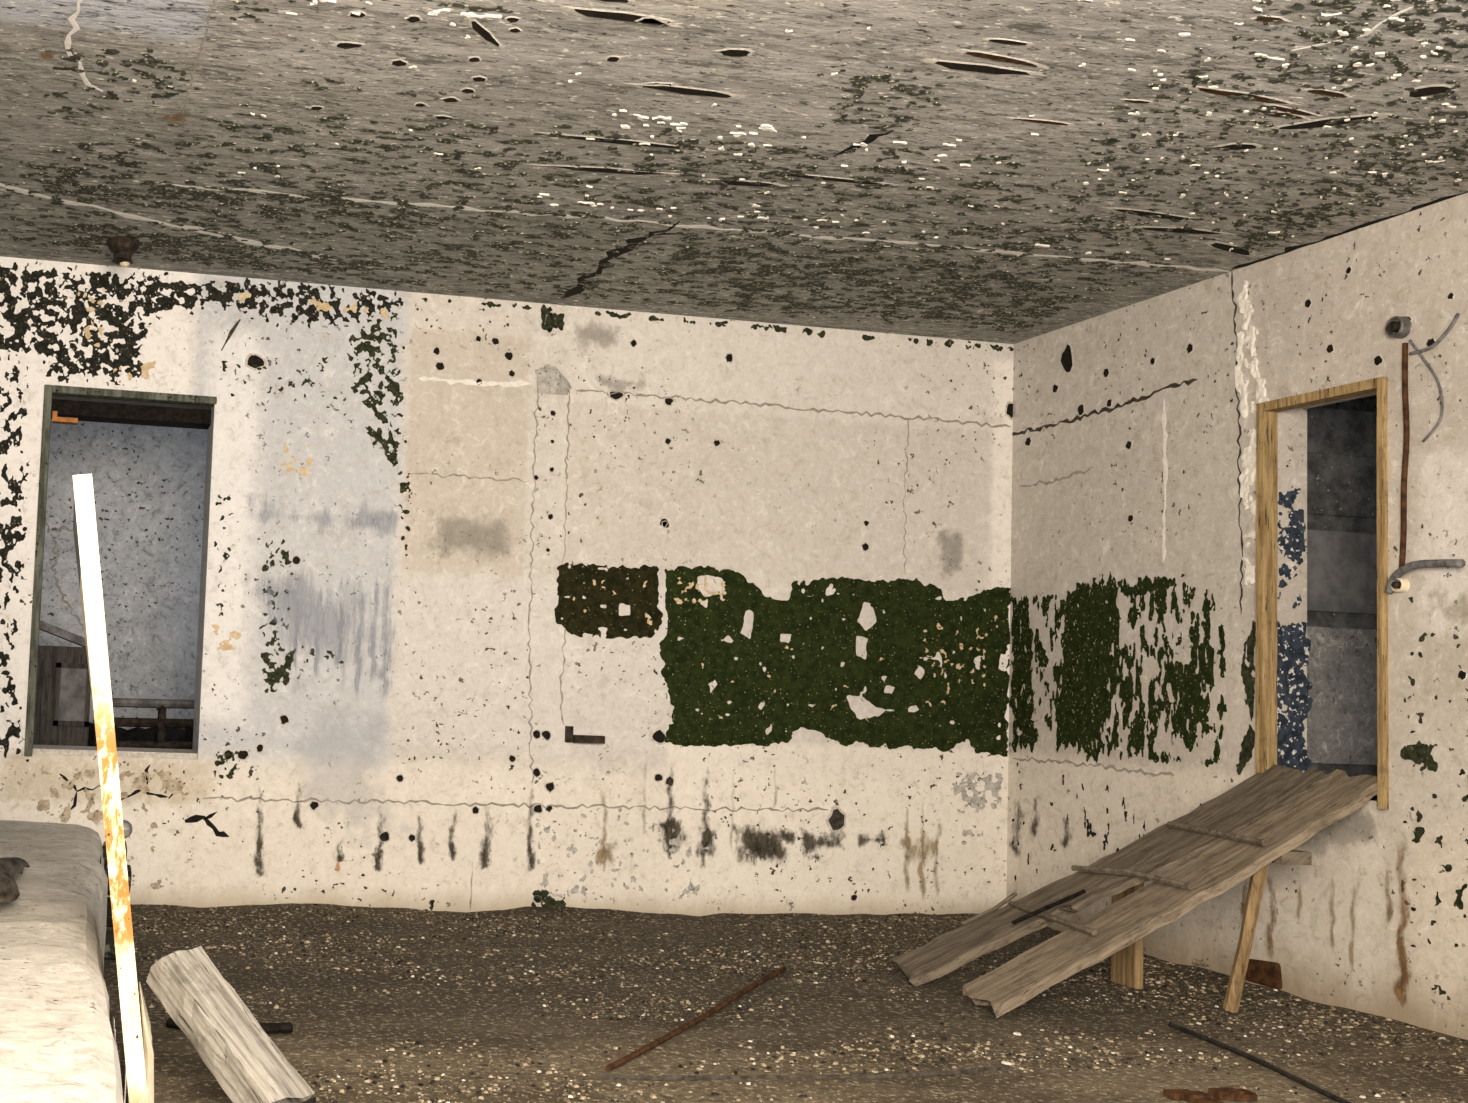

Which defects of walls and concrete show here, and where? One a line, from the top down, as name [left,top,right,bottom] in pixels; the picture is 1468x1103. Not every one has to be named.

crack [0,180,1468,613]
peeling [0,0,1468,854]
water stain [375,823,383,871]
water stain [481,825,490,868]
water stain [527,808,535,870]
water stain [596,834,611,864]
water stain [659,779,675,856]